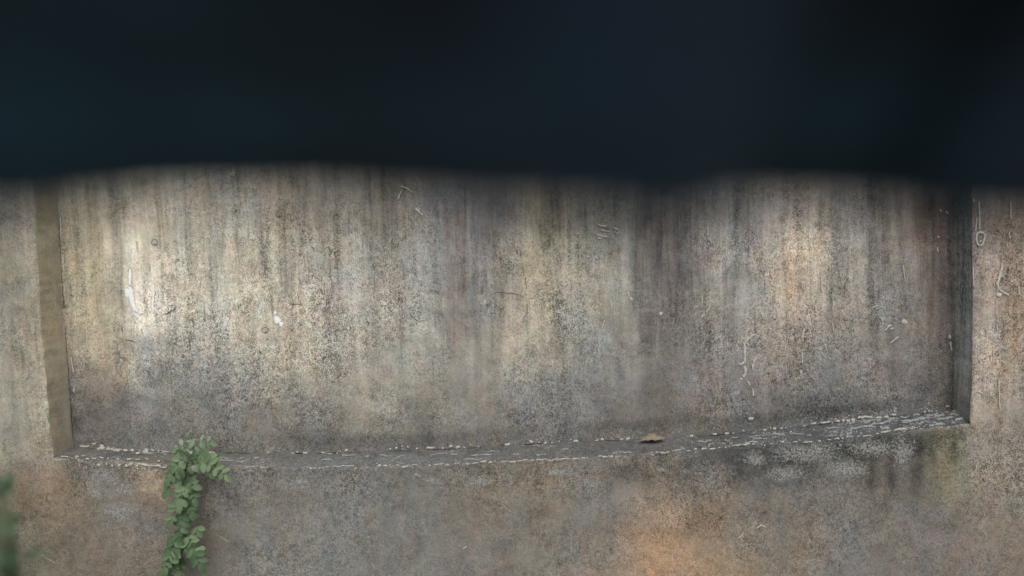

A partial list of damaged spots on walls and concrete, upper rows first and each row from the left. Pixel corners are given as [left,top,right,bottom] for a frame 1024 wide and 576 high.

efflorescence [125,269,155,314]